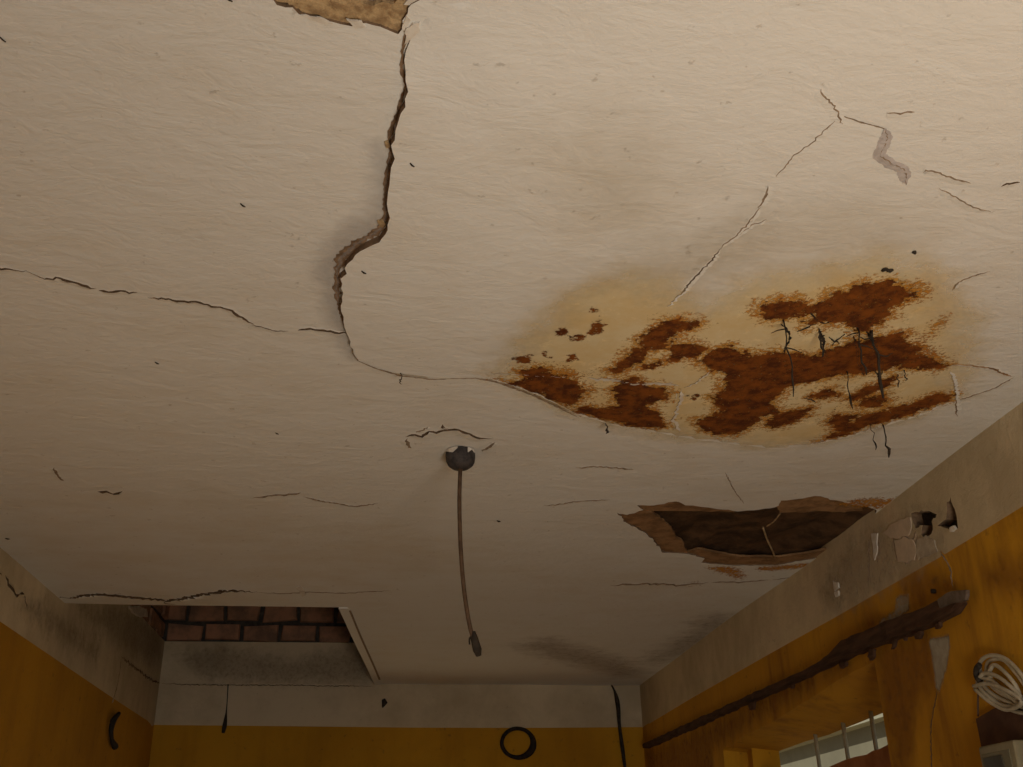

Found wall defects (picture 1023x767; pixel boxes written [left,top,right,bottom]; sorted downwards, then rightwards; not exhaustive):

flaking render [276,0,417,31]
crack [886,108,915,119]
crack [667,89,845,307]
crack [923,167,991,213]
crack [1000,179,1020,188]
crack [0,21,709,432]
rust [486,259,965,447]
crack [401,425,497,451]
crack [253,492,378,507]
flaking render [620,496,874,565]
crack [0,569,28,608]
crack [59,586,387,604]